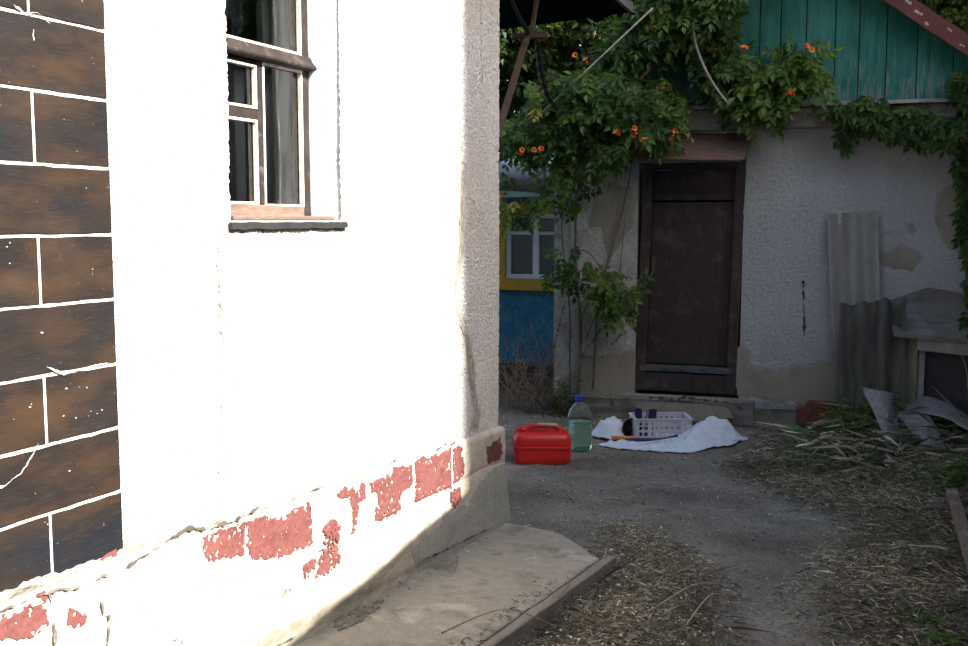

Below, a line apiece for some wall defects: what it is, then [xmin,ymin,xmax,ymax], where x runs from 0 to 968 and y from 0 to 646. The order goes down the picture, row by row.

flaking render [935,184,961,250]
flaking render [879,243,924,272]
peeling [487,436,503,464]
peeling [202,445,465,580]
peeling [0,590,49,641]
peeling [66,608,88,630]
spalling [333,599,384,630]